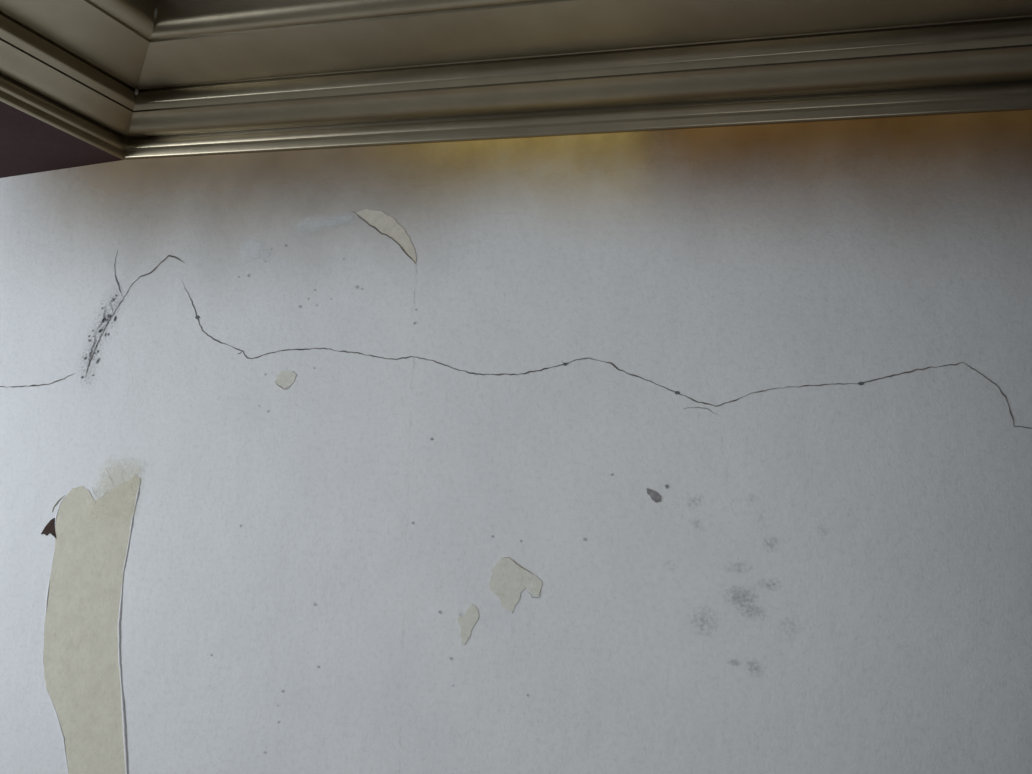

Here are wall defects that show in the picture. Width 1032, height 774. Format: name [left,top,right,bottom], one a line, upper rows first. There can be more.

spalling [352,209,416,264]
crack [0,251,183,388]
crack [185,289,1032,429]
peeling [42,474,141,774]
spalling [489,557,542,613]